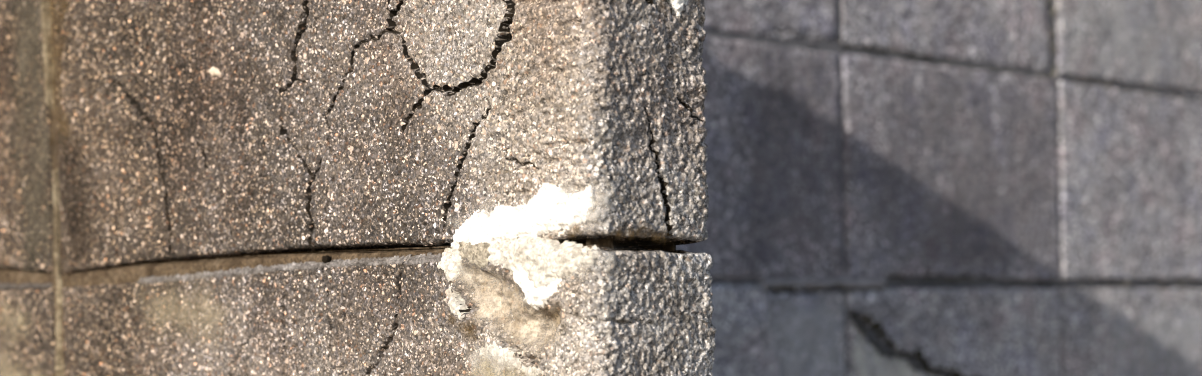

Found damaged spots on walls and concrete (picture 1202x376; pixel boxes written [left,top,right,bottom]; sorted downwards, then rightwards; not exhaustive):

crack [112,80,171,254]
crack [279,0,516,356]
crack [505,157,539,169]
crack [644,107,673,236]
crack [677,97,703,121]
crack [850,311,963,376]